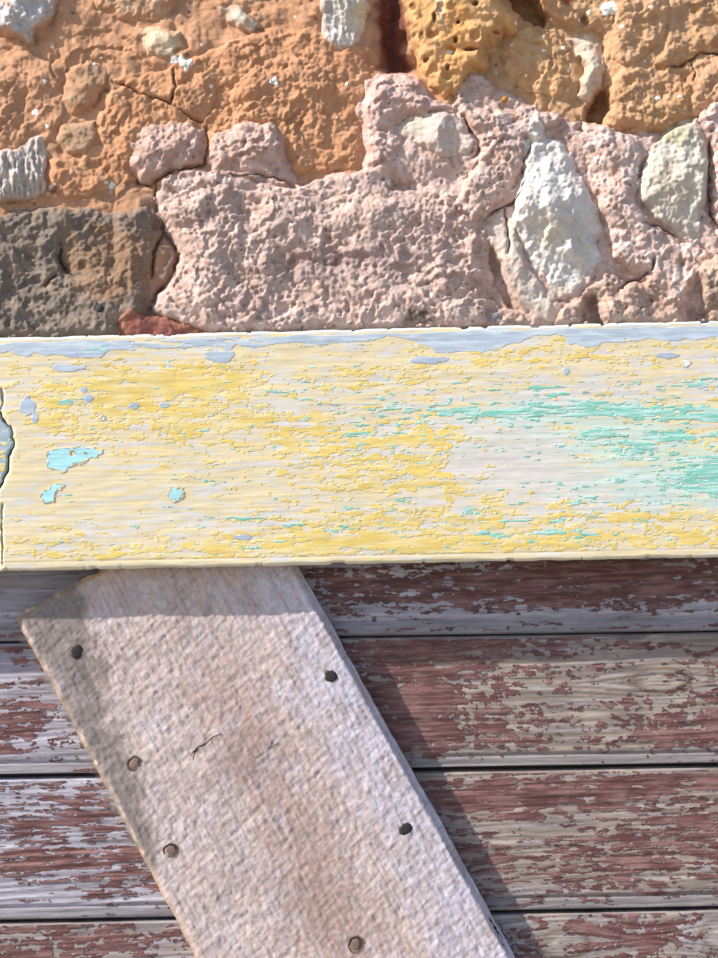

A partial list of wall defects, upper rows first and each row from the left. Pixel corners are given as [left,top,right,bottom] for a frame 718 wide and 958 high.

leakage [377,0,410,73]
crack [485,143,531,250]
peeling [0,326,718,958]